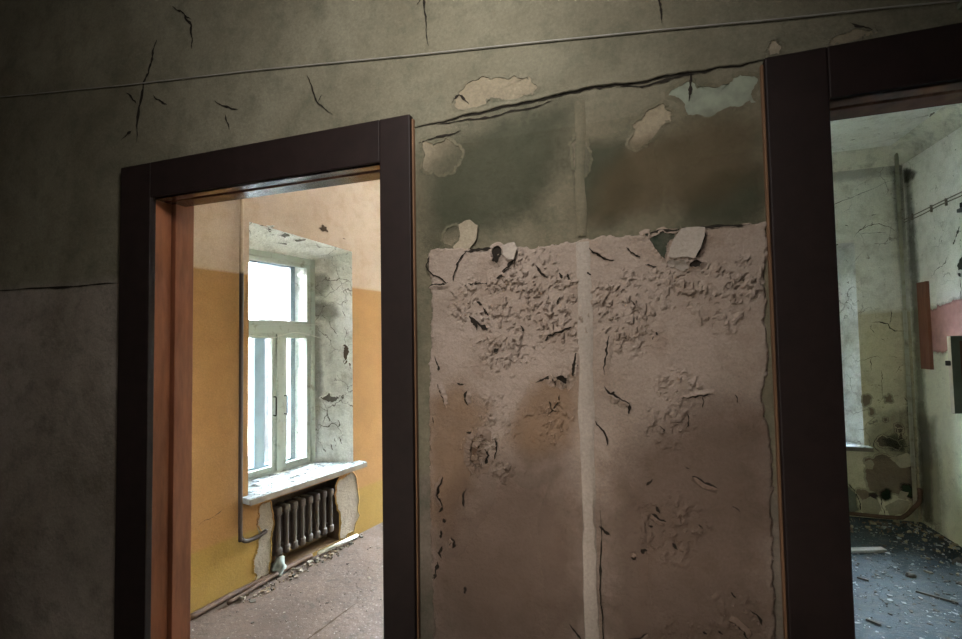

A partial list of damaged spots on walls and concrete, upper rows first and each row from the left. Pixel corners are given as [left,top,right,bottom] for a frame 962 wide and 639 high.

crack [415,52,765,143]
peeling [623,71,761,154]
crack [425,250,511,353]
peeling [440,220,517,272]
crack [520,247,657,341]
crack [599,336,631,414]
peeling [639,224,750,272]
damp [869,169,932,522]
peeling [849,393,918,516]
peeling [248,461,360,581]
crack [433,475,466,579]
crack [570,514,610,639]